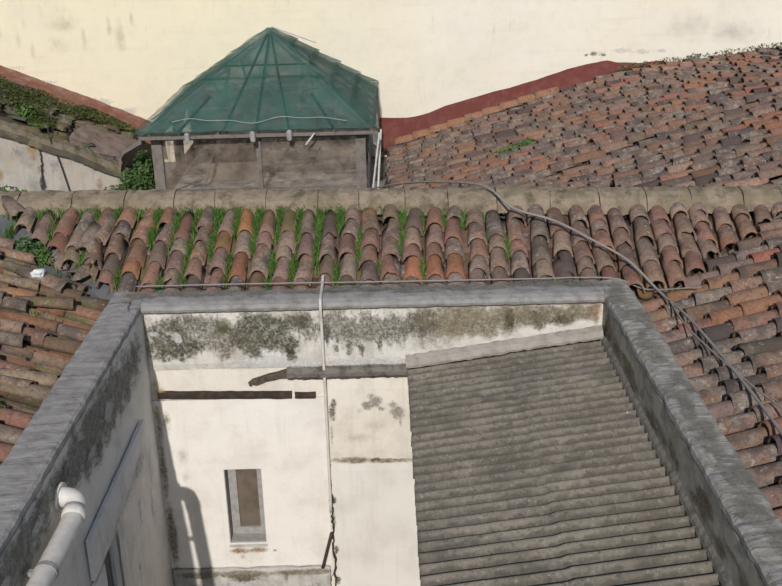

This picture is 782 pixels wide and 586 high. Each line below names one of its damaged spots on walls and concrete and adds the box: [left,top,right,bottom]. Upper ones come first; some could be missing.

crack [39,149,47,189]
leakage [146,303,595,361]
leakage [605,316,619,355]
leakage [363,395,403,423]
crack [329,464,337,586]
leakage [182,569,340,583]